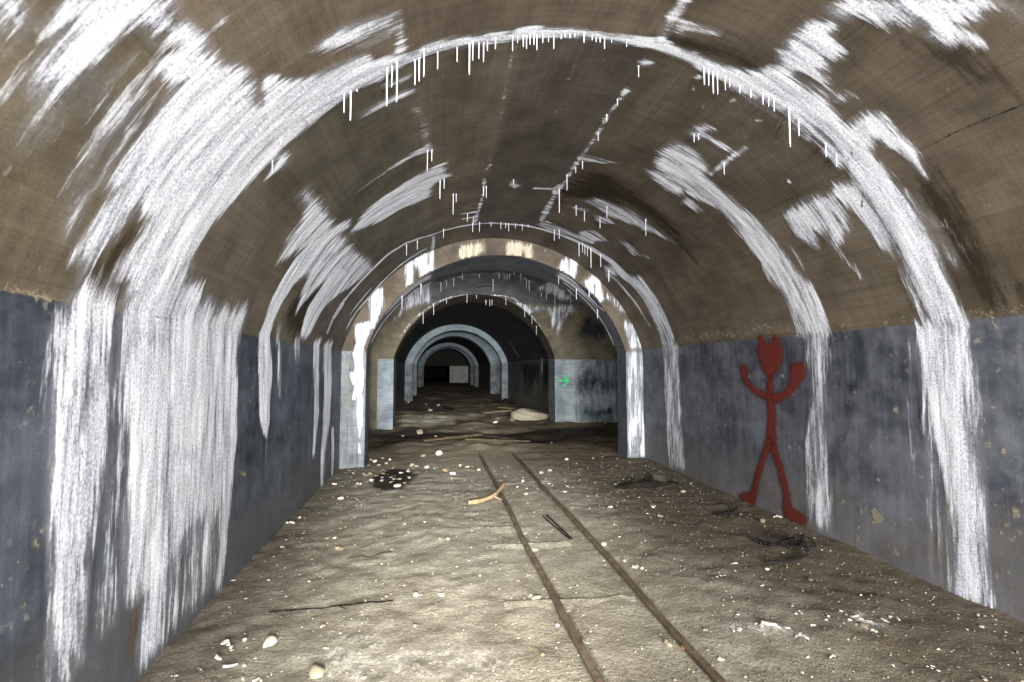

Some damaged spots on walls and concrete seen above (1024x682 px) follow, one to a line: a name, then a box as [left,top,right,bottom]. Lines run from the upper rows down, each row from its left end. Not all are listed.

crack [269,600,393,613]
water stain [36,0,723,682]
water stain [648,20,997,608]
water stain [835,0,996,79]